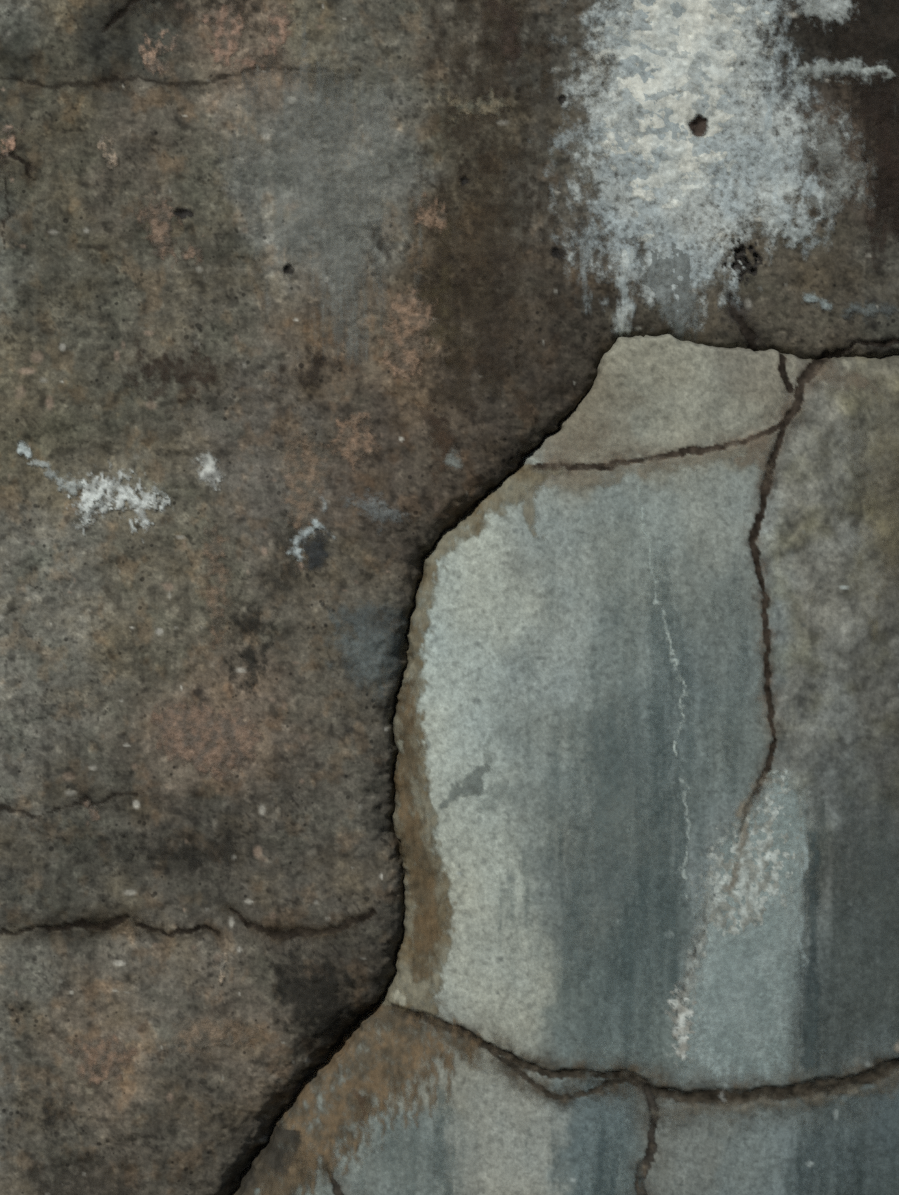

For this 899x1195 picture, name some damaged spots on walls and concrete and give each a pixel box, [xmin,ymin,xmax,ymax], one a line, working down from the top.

water stain [554,0,899,337]
spalling [416,193,447,229]
spalling [382,288,431,379]
spalling [327,413,375,470]
crack [529,292,899,1040]
spalling [152,702,262,778]
crack [0,907,376,940]
water stain [668,770,899,1080]
spalling [70,1035,137,1084]
crack [389,1002,899,1195]
crack [328,1170,344,1195]